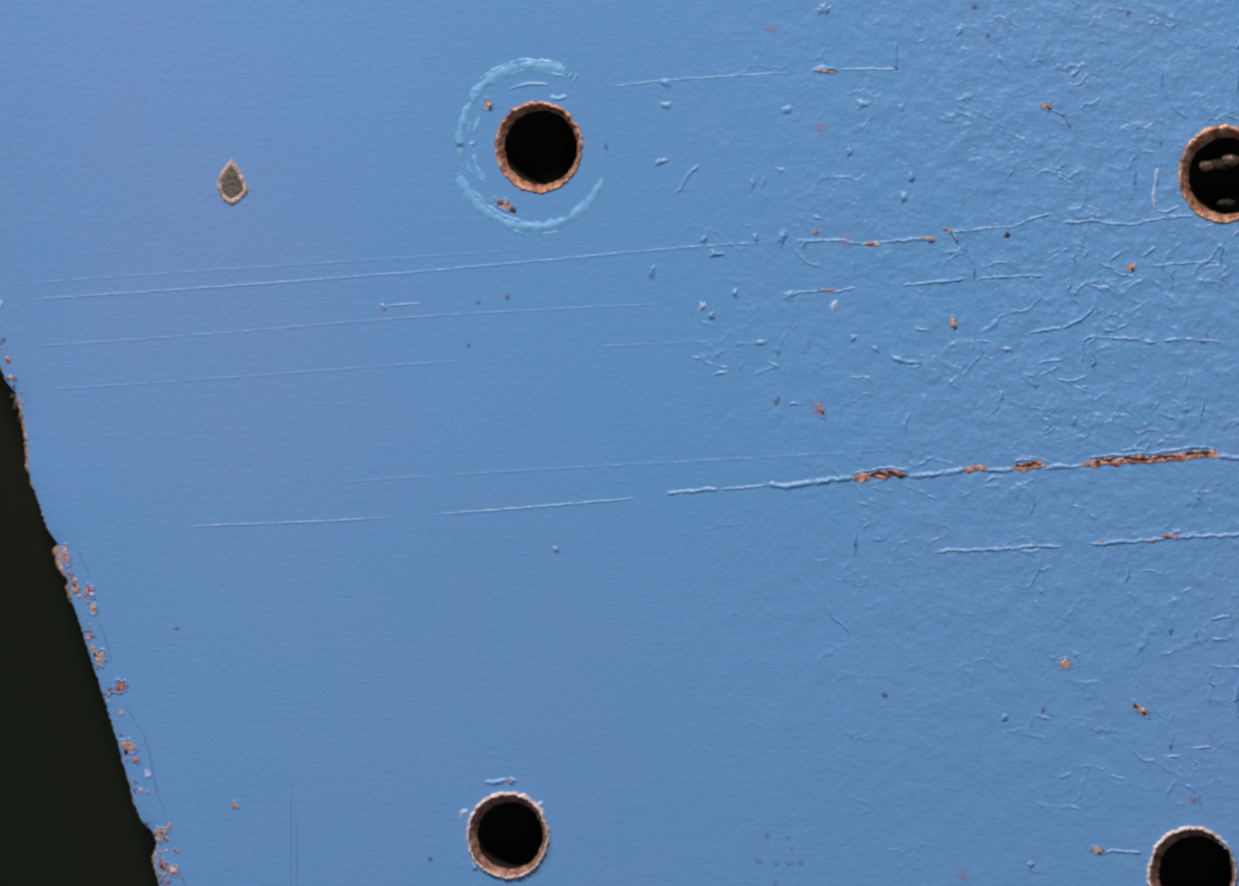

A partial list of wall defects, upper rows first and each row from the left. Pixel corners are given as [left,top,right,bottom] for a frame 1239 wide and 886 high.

peeling [0,337,25,404]
crack [421,370,1239,555]
peeling [61,542,108,670]
peeling [103,677,129,716]
peeling [118,731,152,794]
peeling [145,821,182,886]